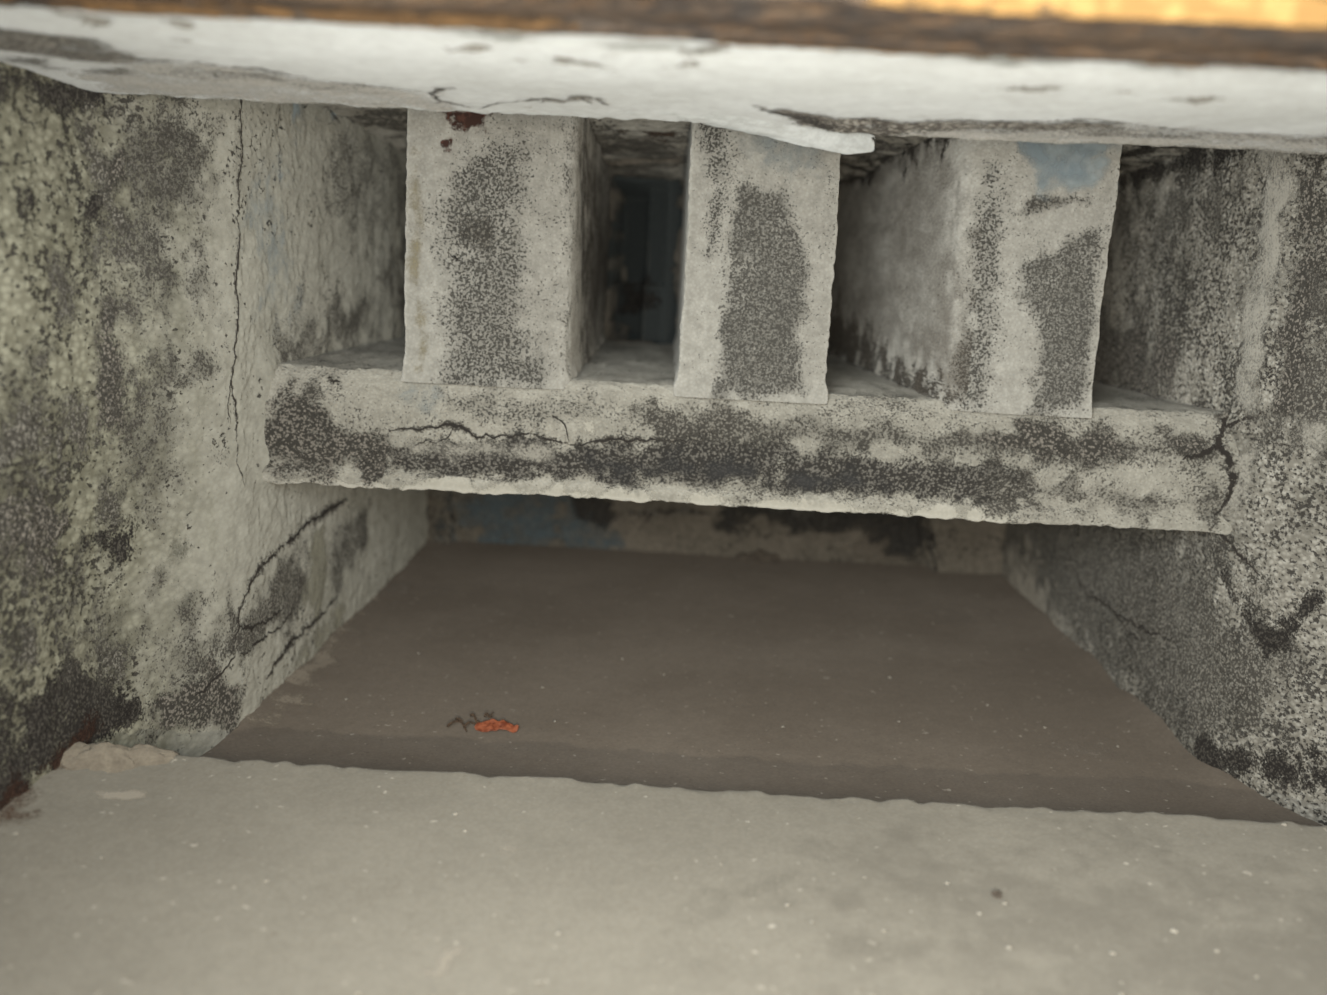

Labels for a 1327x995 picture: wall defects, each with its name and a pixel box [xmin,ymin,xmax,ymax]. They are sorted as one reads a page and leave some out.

damp [0,28,313,810]
crack [195,497,347,696]
crack [157,60,608,485]
crack [389,415,707,448]
damp [263,116,1327,796]
crack [1182,408,1262,576]